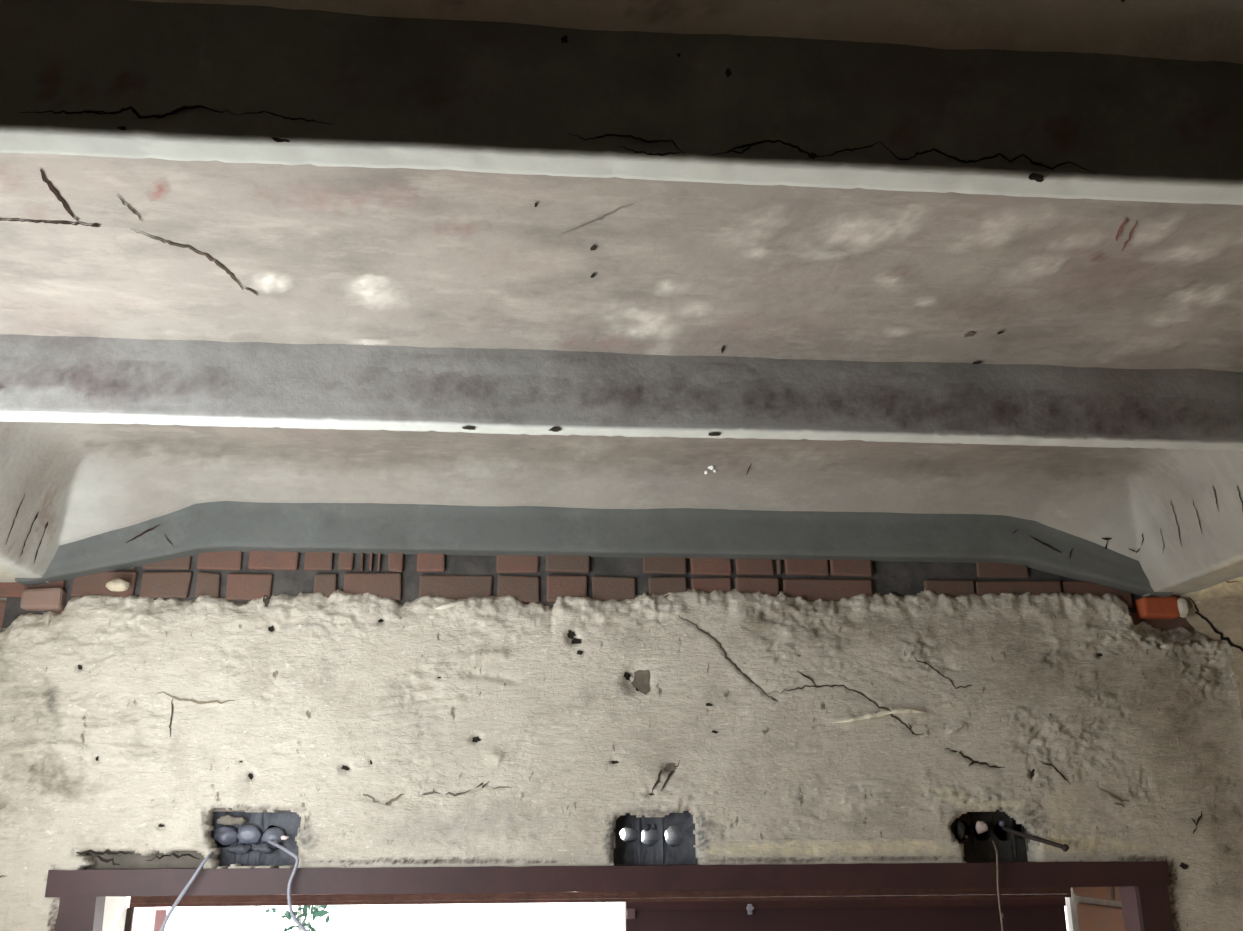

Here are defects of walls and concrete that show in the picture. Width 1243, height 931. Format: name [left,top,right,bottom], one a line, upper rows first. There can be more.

crack [20,105,330,124]
crack [568,133,1095,174]
crack [117,195,258,296]
crack [678,615,1005,768]
crack [1040,761,1070,784]